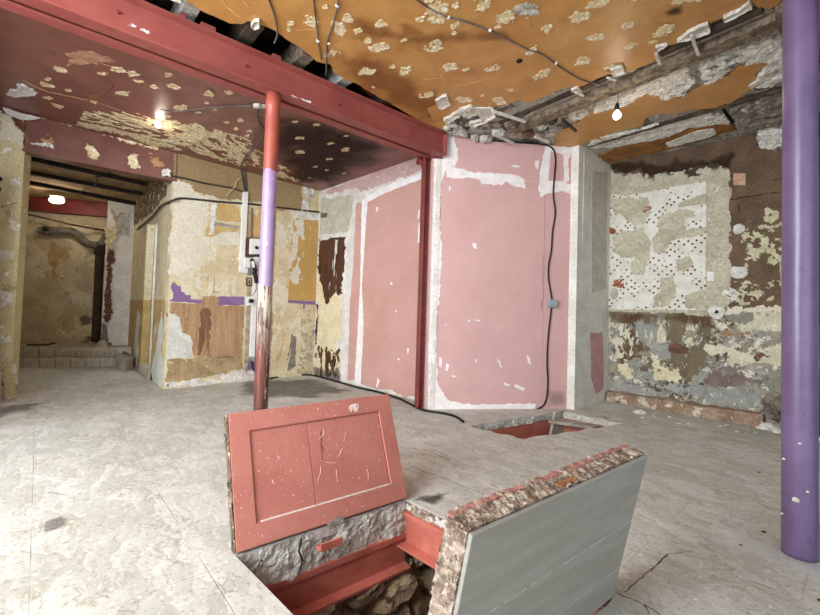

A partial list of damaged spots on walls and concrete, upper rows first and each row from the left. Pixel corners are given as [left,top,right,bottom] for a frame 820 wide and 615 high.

spalling [331,13,391,53]
spalling [415,0,460,35]
spalling [494,2,540,30]
flaking render [566,33,782,149]
peeling [62,90,263,290]
peeling [273,165,347,374]
spalling [611,176,708,276]
peeling [741,207,782,268]
flaking render [150,312,255,389]
flaking render [608,256,781,424]
crack [297,538,305,576]
crack [617,551,692,615]